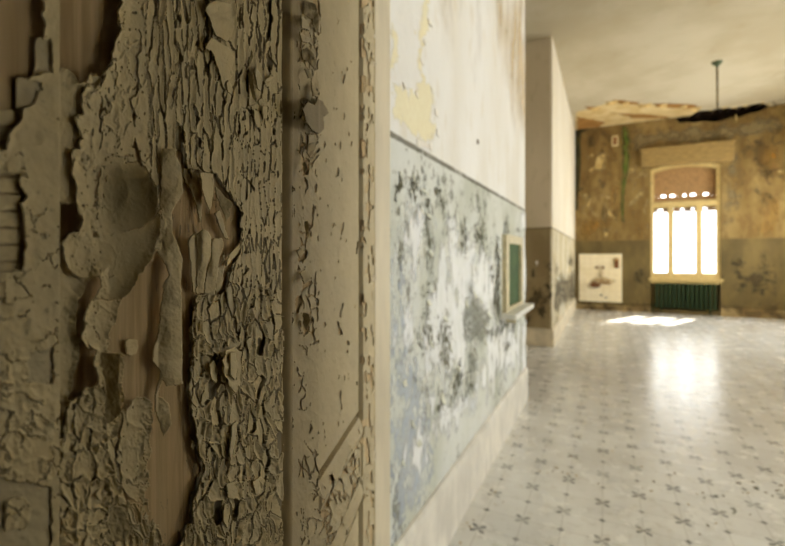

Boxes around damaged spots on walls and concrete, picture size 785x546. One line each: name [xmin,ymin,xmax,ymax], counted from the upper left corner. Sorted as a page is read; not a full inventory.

crack [145,0,282,291]
peeling [392,0,439,151]
leakage [393,165,441,215]
flaking render [575,100,712,130]
peeling [0,0,376,546]
leakage [487,220,520,355]
leakage [527,264,552,322]